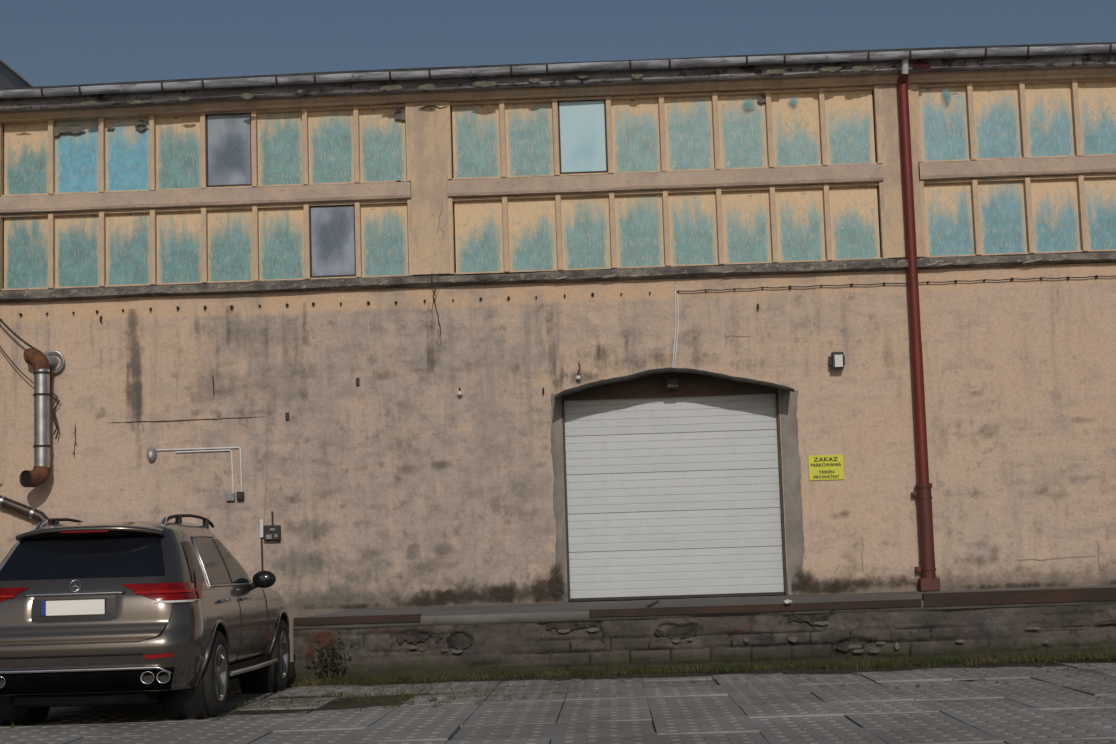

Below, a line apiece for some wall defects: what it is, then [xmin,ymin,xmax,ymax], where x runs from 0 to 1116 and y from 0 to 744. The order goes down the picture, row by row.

crack [431,274,441,343]
damp [127,312,142,419]
damp [398,567,564,606]